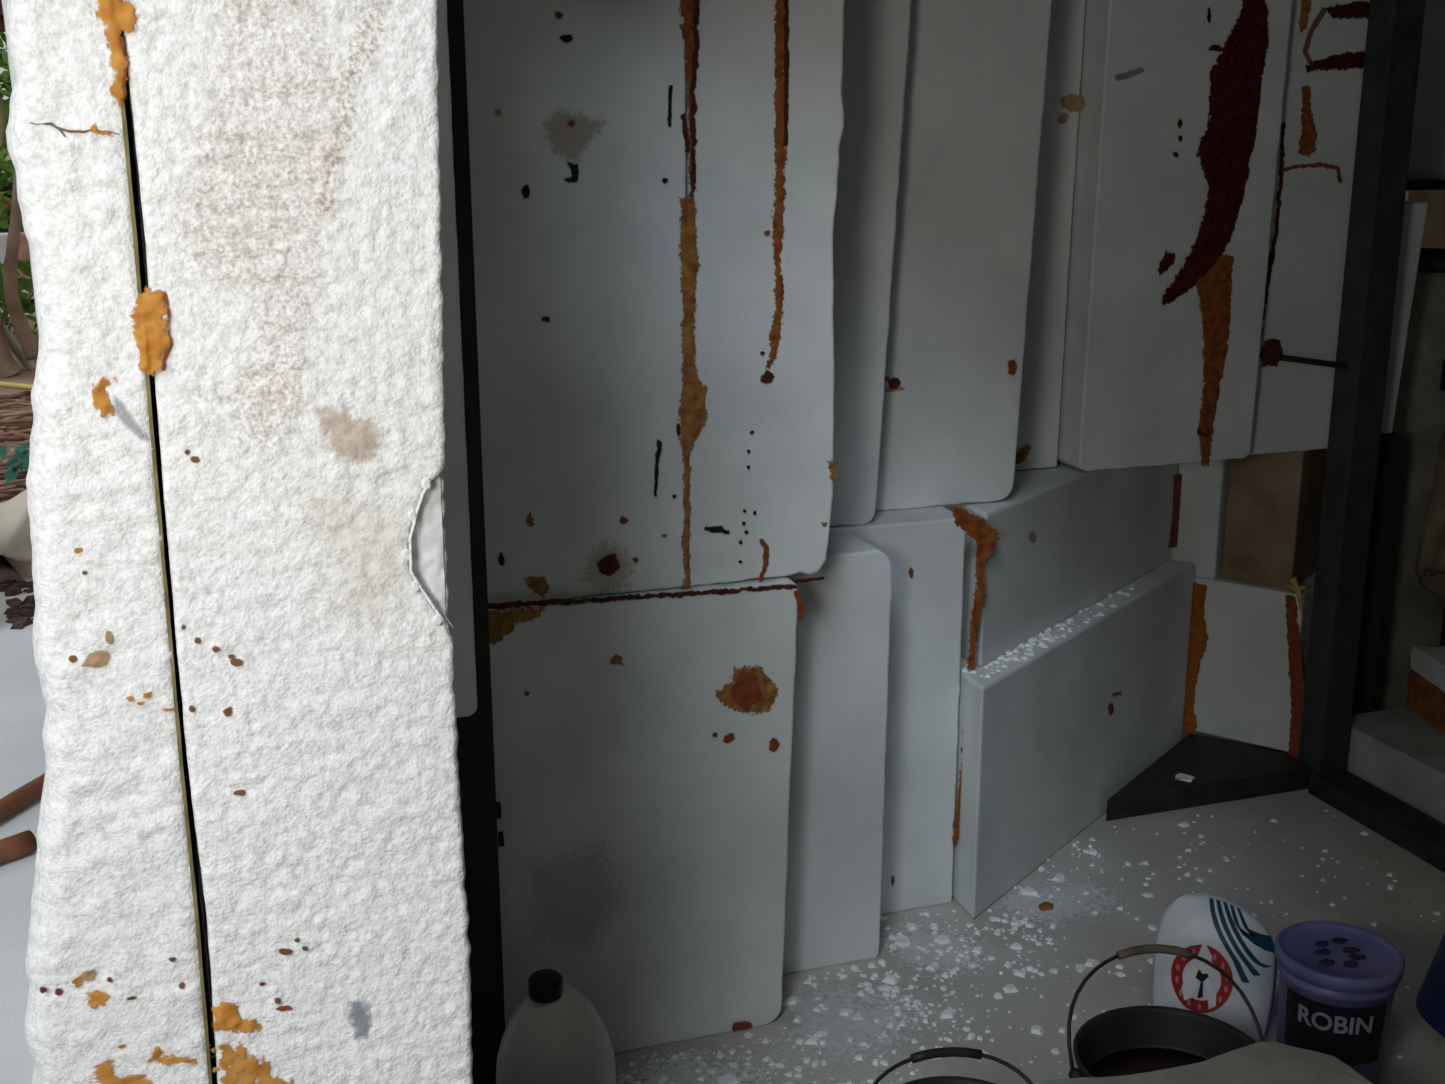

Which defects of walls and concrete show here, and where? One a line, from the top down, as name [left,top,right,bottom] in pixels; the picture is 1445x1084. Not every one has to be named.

rust [95,0,136,108]
rust [1282,0,1370,183]
rust [1158,0,1269,468]
rust [130,287,173,376]
rust [488,0,824,645]
spalling [402,474,454,628]
rust [716,665,779,716]
rust [952,505,999,670]
rust [1182,582,1209,739]
rust [40,969,112,1009]
rust [89,1044,197,1084]
rust [211,1002,293,1084]